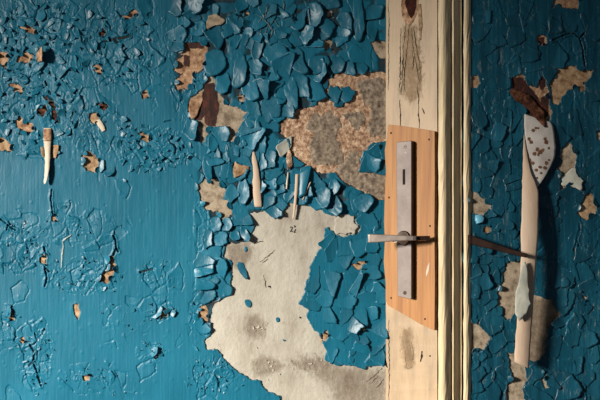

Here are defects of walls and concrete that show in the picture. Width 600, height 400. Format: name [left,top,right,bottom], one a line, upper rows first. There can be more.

flaking render [0,0,151,184]
corrosion [194,83,219,126]
corrosion [512,77,549,117]
peeling [5,304,20,327]
flaking render [81,0,388,400]
peeling [461,65,600,400]